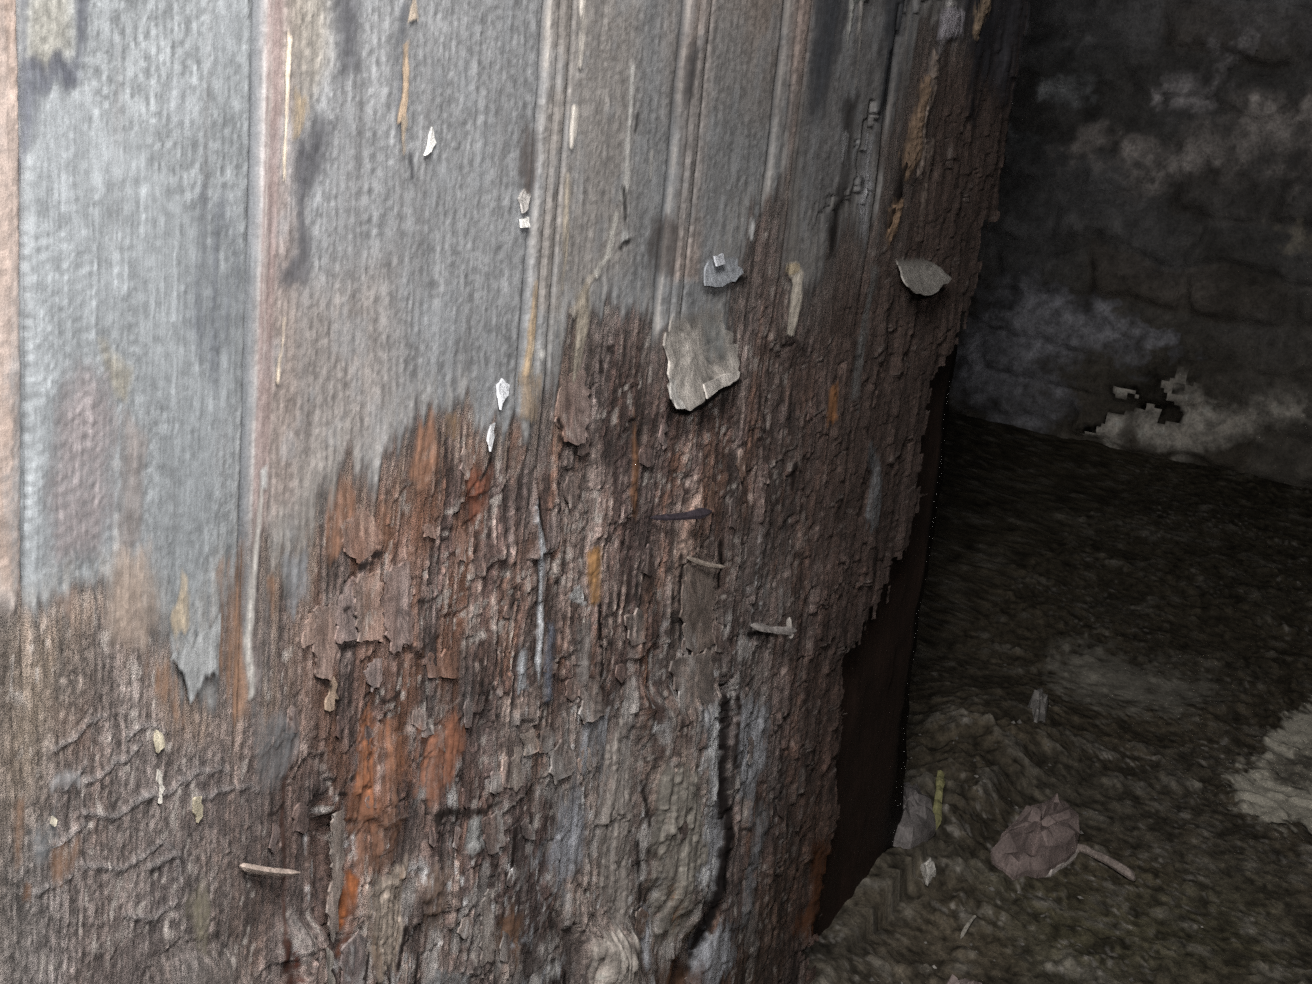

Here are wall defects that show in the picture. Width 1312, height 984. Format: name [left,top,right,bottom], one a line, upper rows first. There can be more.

peeling [283,32,305,180]
peeling [487,285,544,452]
peeling [638,314,741,467]
peeling [785,261,805,351]
peeling [896,260,951,301]
peeling [171,573,221,703]
peeling [301,503,415,712]
peeling [425,649,459,679]
peeling [668,561,727,713]
peeling [325,810,367,984]
peeling [457,889,512,967]
crack [681,693,741,977]